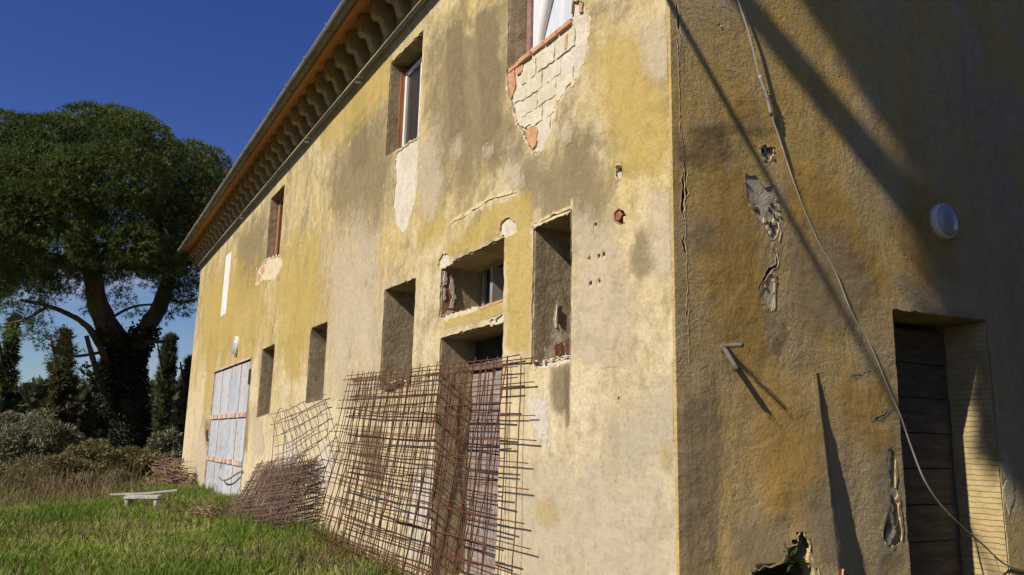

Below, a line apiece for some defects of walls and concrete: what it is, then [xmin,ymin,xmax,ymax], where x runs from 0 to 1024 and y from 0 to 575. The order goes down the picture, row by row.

flaking render [504,2,591,170]
flaking render [393,136,419,236]
flaking render [496,217,516,239]
spalling [614,208,626,225]
crack [675,3,691,379]
flaking render [744,171,781,239]
flaking render [254,254,283,287]
flaking render [436,250,504,327]
flaking render [533,299,571,371]
leakage [529,365,569,441]
flaking render [880,446,904,550]
spalling [750,530,820,575]